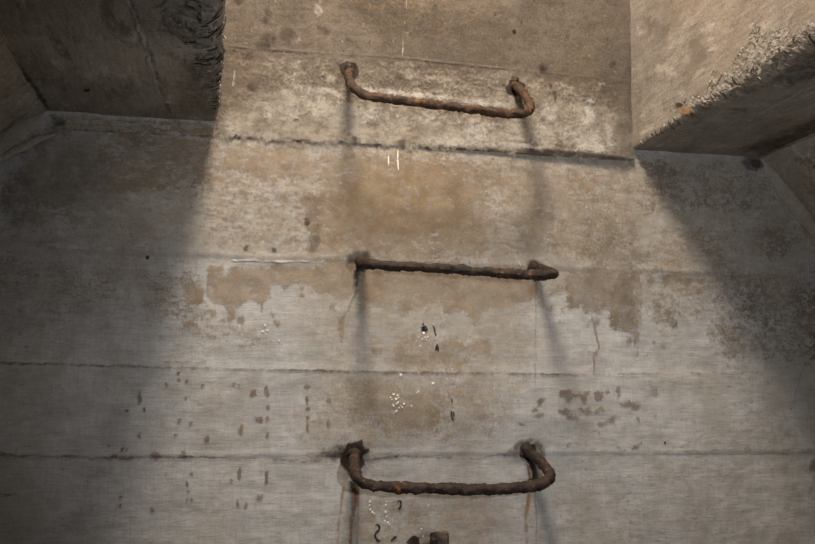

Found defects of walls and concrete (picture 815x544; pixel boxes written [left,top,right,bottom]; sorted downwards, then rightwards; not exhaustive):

spalling [148,0,226,115]
spalling [639,19,815,145]